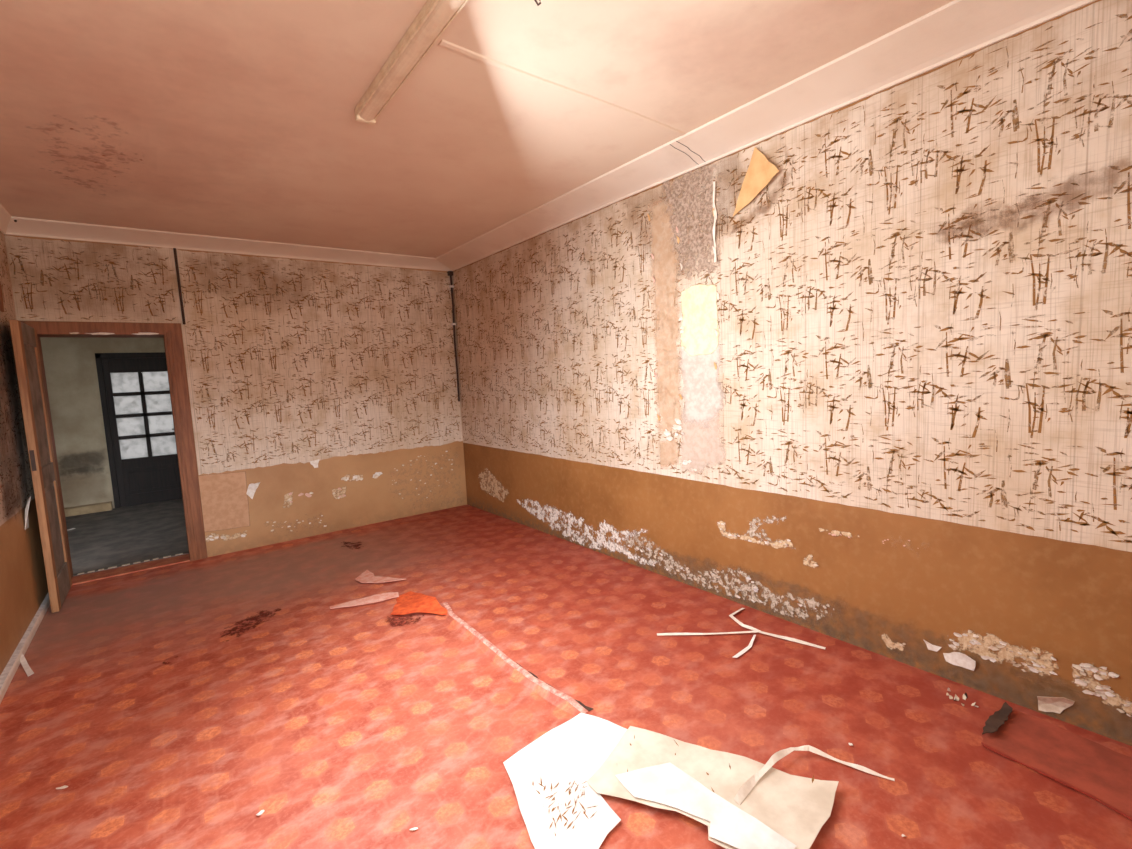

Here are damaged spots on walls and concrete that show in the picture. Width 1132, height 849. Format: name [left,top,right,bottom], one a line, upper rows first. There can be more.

water stain [0,330,27,513]
peeling [654,408,682,441]
peeling [247,483,260,499]
peeling [332,451,453,499]
peeling [266,492,327,531]
peeling [205,530,247,542]
water stain [517,499,834,620]
peeling [881,634,906,651]
peeling [924,630,1132,717]